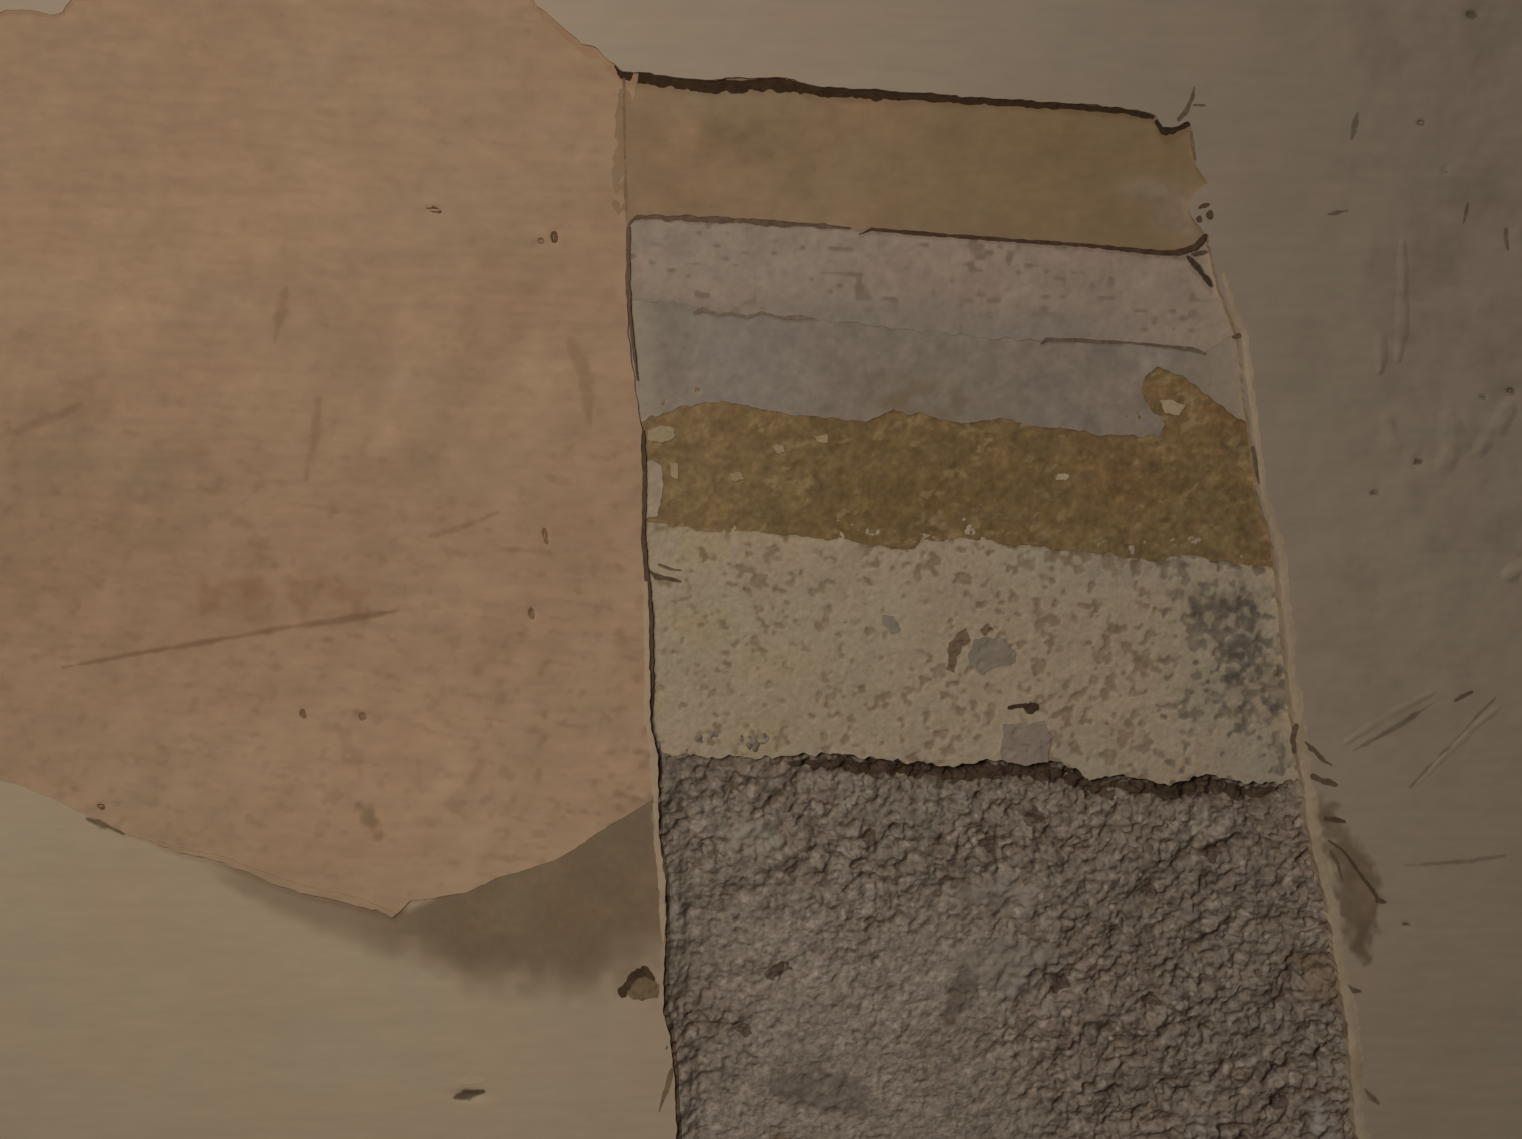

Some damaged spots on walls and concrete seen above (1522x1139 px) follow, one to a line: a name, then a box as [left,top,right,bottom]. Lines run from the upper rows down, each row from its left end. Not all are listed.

crack [614,65,1212,380]
peeling [1198,203,1214,220]
peeling [0,0,1206,943]
flaking render [627,219,1386,1139]
damp [398,797,665,974]
spalling [618,966,659,1001]